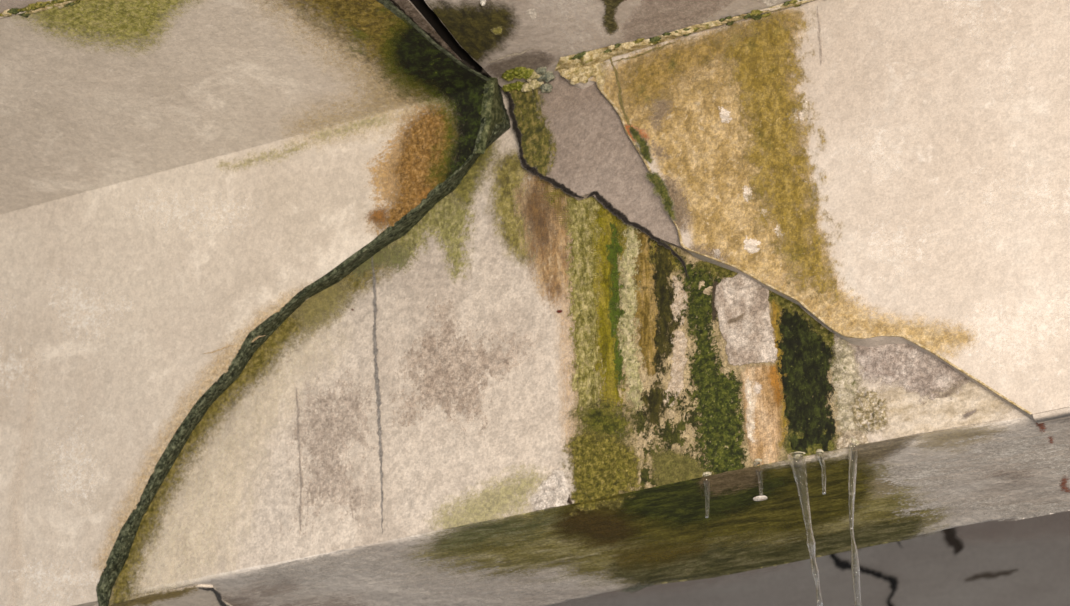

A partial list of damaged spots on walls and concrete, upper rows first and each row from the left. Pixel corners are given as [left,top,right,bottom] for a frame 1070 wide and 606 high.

water stain [602,0,732,42]
water stain [487,52,553,78]
peeling [719,107,732,124]
peeling [792,97,811,123]
peeling [744,236,761,253]
crack [96,0,689,606]
spalling [699,273,778,366]
peeling [663,276,688,407]
water stain [8,143,1001,606]
spalling [531,469,572,511]
crack [830,554,898,606]